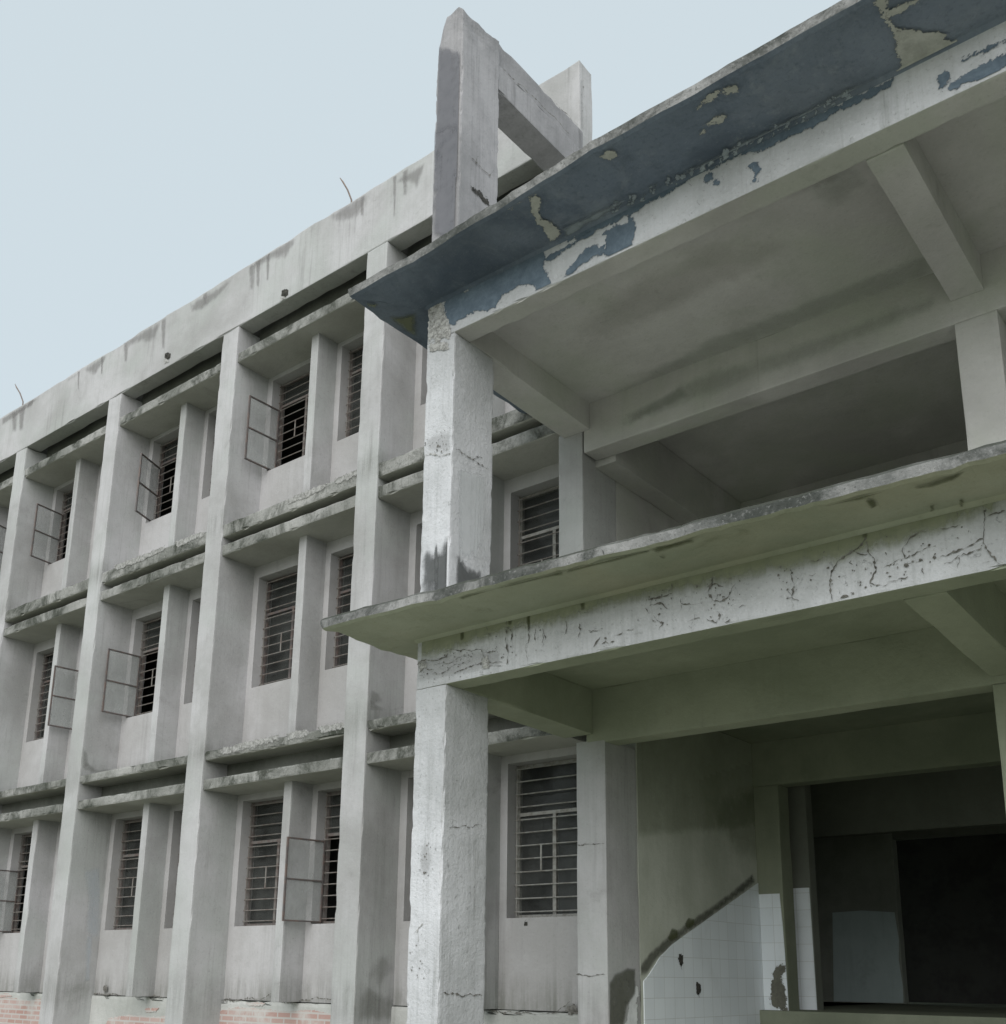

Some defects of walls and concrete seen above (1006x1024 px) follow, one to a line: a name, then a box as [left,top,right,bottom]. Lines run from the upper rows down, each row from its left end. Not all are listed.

peeling [937,39,1006,91]
peeling [428,0,957,352]
damp [424,470,484,591]
crack [777,507,1005,603]
crack [645,575,752,628]
crack [417,621,629,673]
peeling [769,963,788,1011]